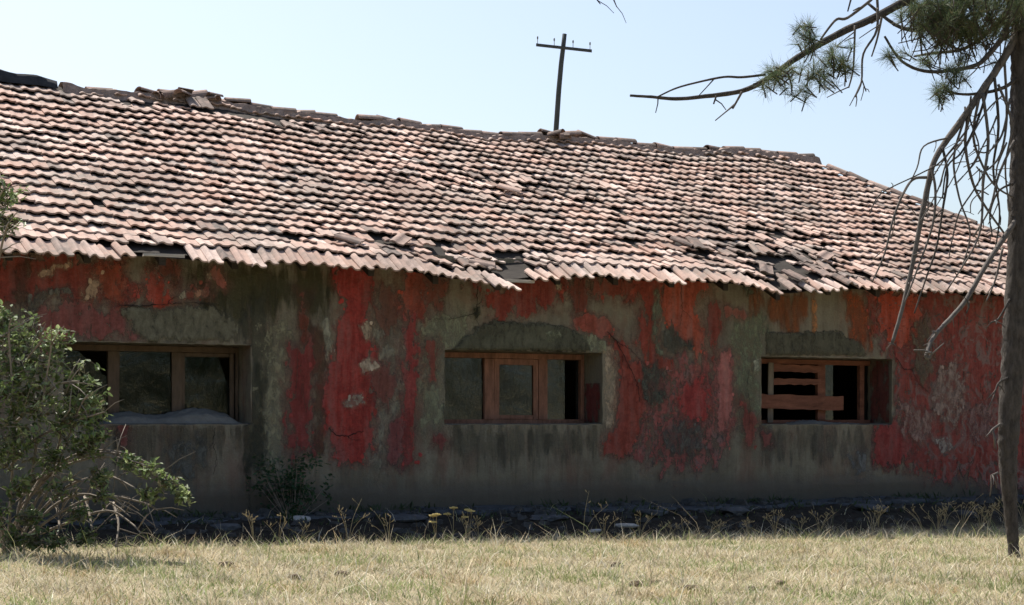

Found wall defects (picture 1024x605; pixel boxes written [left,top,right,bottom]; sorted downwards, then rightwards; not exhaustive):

peeling [0,253,227,358]
peeling [280,266,380,467]
peeling [396,270,450,474]
peeling [472,277,754,461]
peeling [863,290,1005,494]